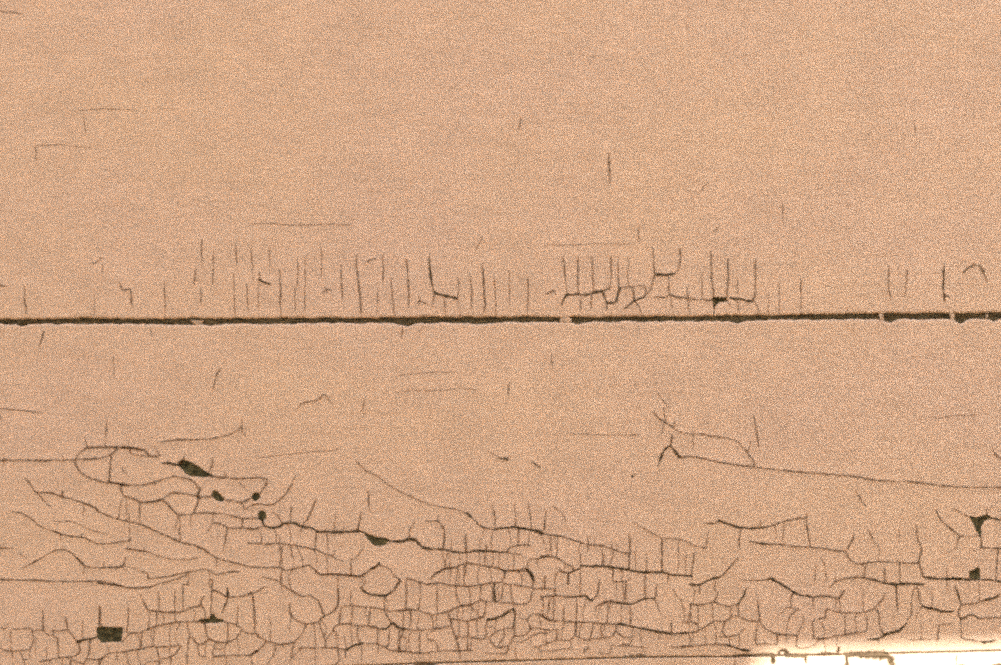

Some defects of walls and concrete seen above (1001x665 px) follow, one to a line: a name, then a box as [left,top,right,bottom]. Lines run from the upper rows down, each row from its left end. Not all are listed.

crack [194,228,802,339]
peeling [178,459,213,477]
crack [0,398,1001,665]
peeling [970,514,990,537]
peeling [97,626,123,643]